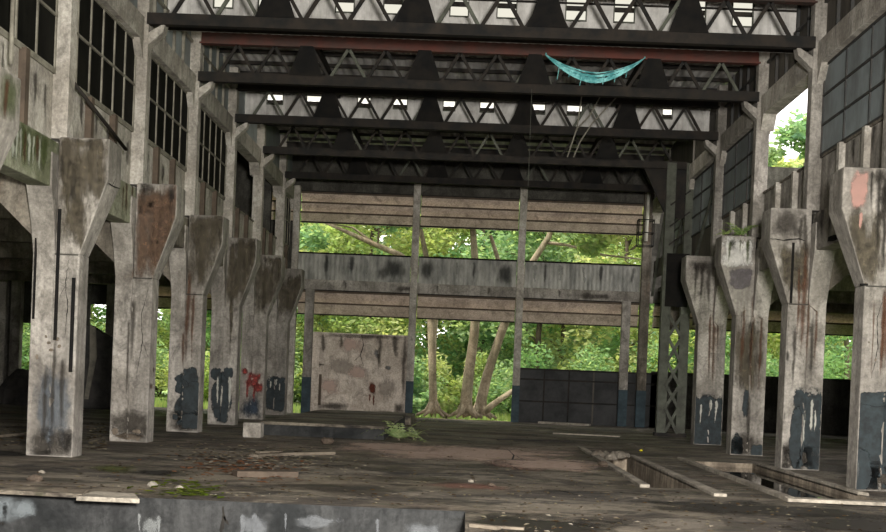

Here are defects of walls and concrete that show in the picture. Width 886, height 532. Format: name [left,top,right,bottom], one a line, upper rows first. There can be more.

damp [11,128,47,169]
peeling [851,172,868,228]
damp [850,172,886,283]
damp [695,263,710,300]
rust [872,295,886,360]
spalling [0,494,465,532]